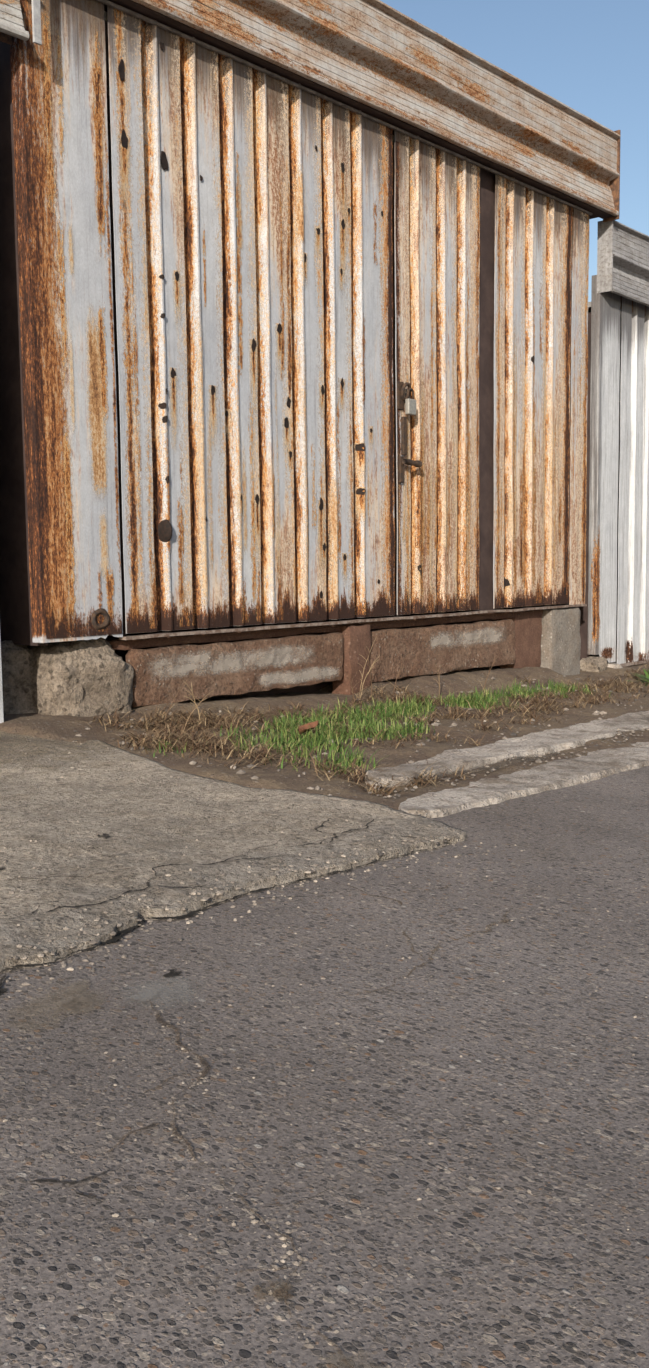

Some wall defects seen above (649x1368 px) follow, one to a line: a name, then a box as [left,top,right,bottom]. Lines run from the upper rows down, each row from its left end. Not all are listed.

rust [0,0,649,667]
crack [0,818,511,1002]